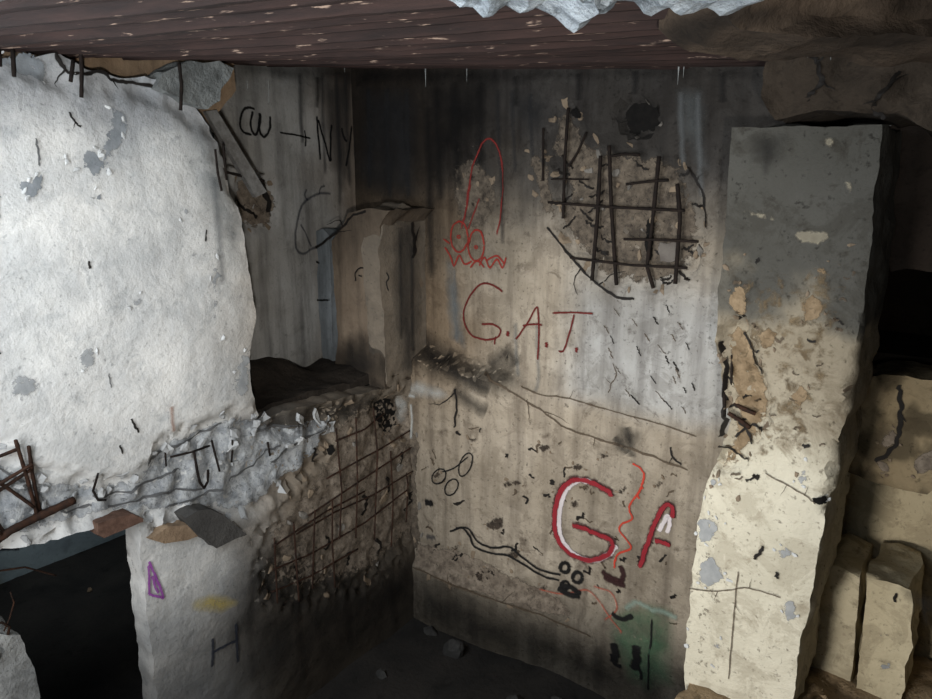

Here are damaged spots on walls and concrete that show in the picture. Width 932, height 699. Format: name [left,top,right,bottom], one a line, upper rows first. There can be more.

spalling [525,97,710,313]
peeling [796,231,828,244]
peeling [12,376,39,401]
peeling [80,348,98,373]
peeling [233,348,250,396]
spalling [703,260,844,500]
crack [874,385,906,463]
spalling [0,384,570,622]
spalling [543,461,587,504]
peeling [694,511,733,618]